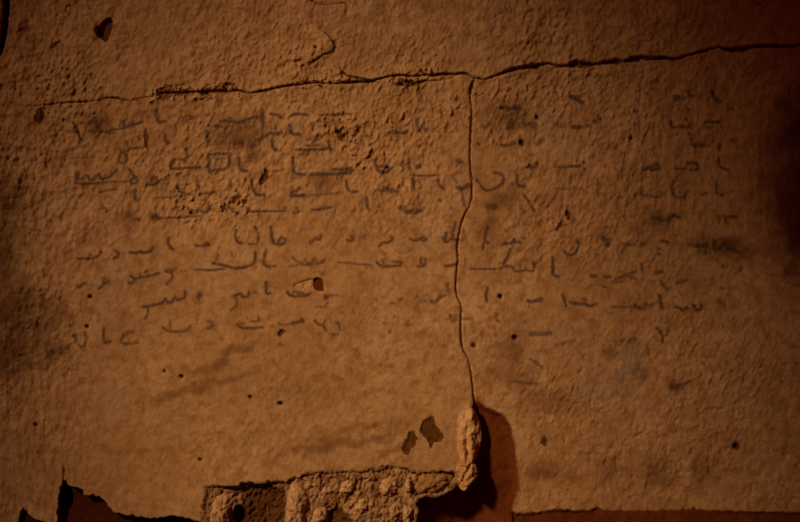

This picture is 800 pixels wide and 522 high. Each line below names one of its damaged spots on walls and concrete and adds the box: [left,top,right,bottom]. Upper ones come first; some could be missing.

hole [97,18,113,41]
crack [8,43,800,403]
flaking render [19,508,43,522]
flaking render [57,401,800,522]